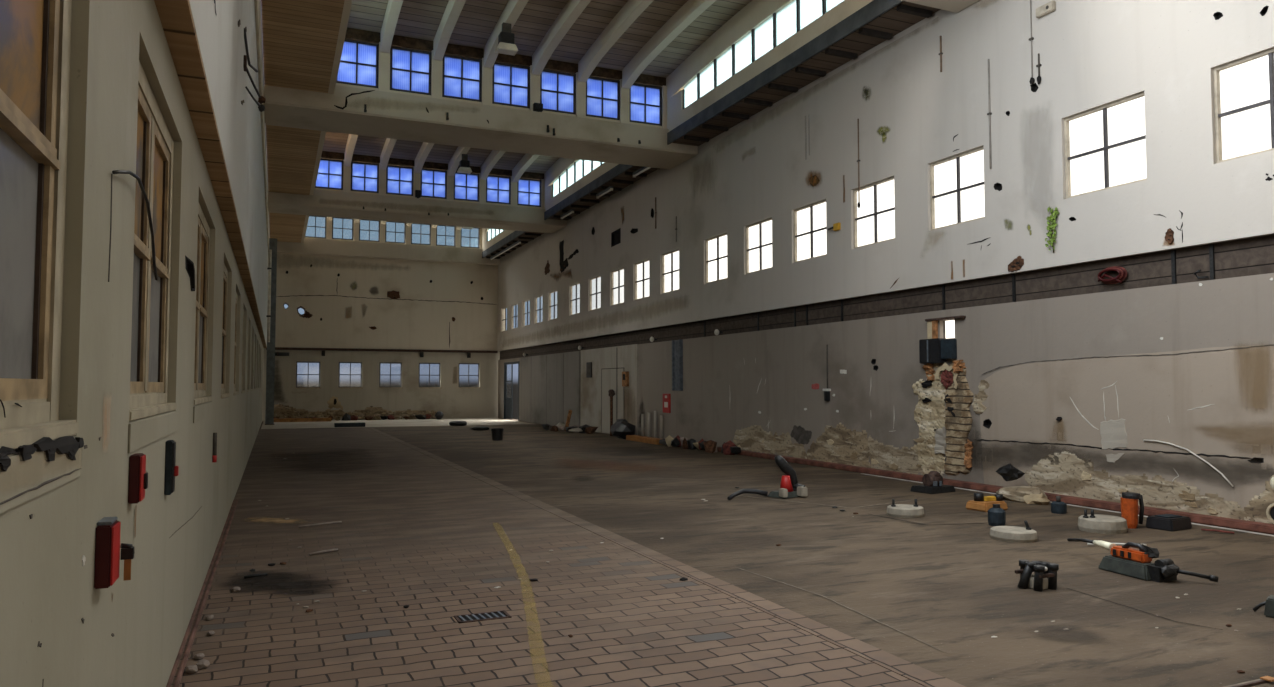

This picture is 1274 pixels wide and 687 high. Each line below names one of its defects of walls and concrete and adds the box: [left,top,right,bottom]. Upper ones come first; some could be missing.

spalling [733,360,990,476]
flaking render [1025,419,1274,524]